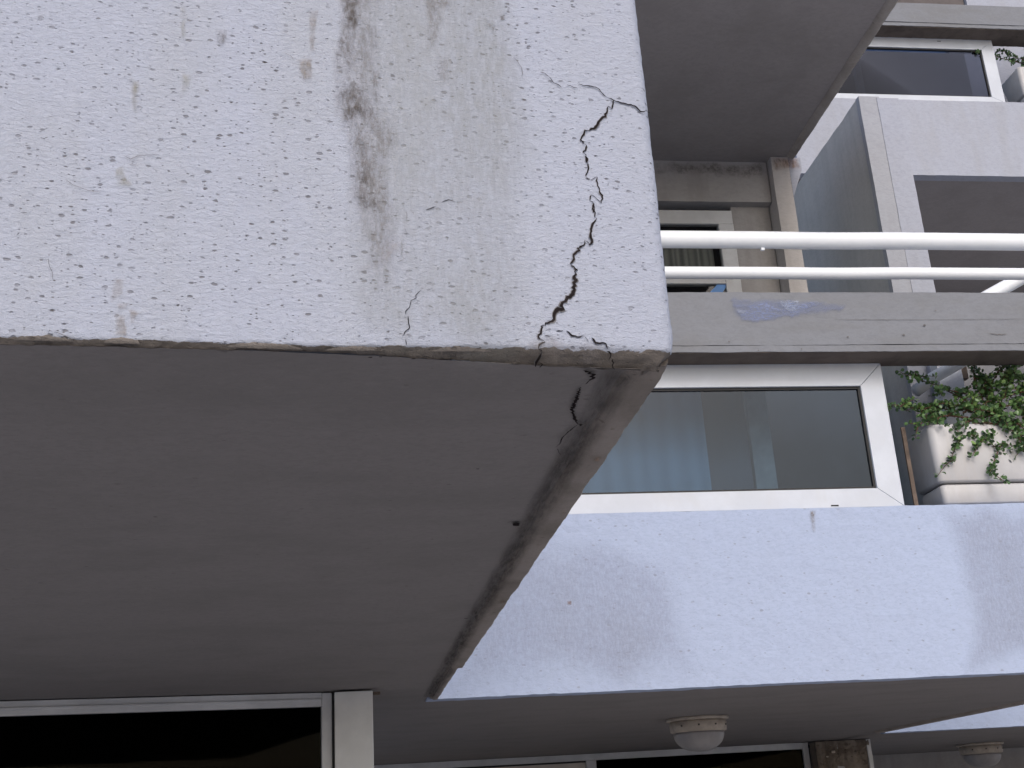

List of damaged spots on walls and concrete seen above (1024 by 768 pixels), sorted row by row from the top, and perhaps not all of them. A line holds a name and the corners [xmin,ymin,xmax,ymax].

crack [517,61,650,455]